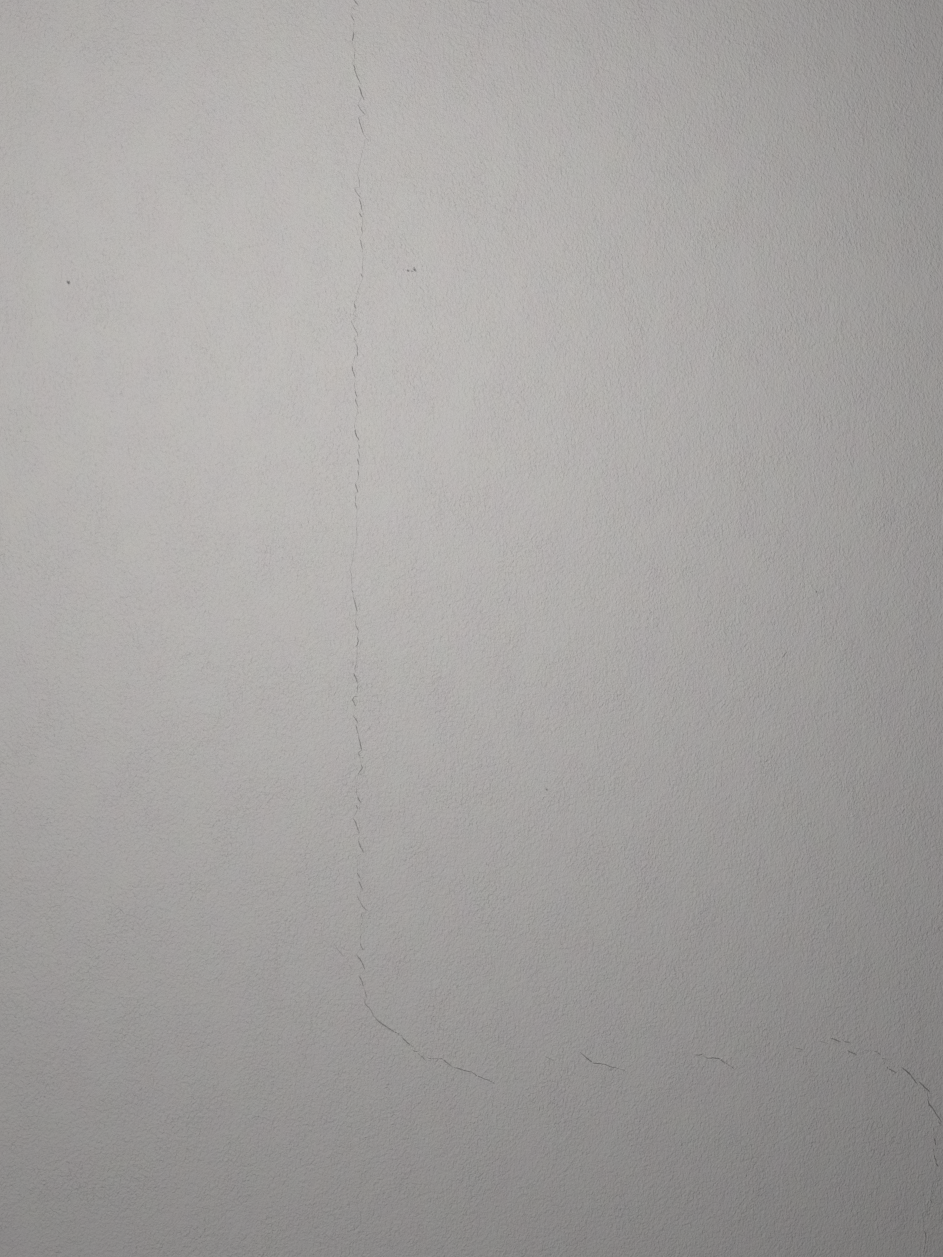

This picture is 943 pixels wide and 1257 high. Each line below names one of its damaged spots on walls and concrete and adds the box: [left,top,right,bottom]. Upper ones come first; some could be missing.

crack [335,0,495,1084]
crack [794,1037,943,1257]